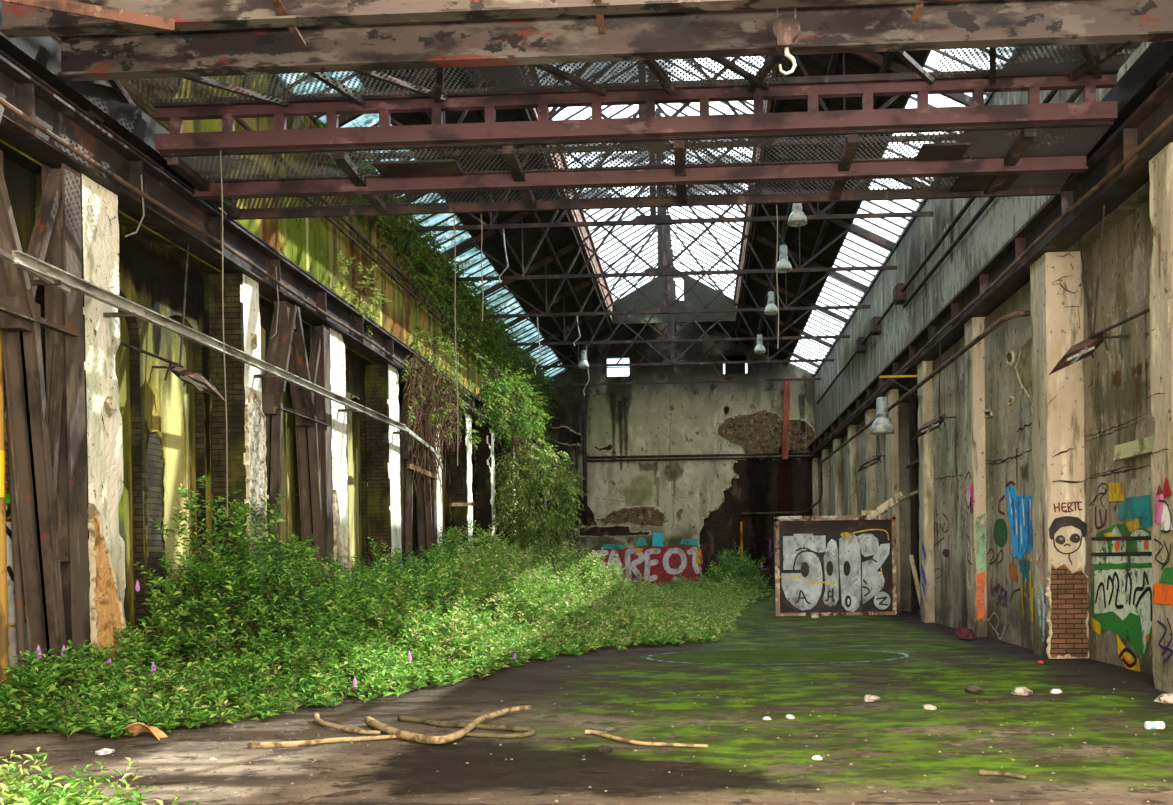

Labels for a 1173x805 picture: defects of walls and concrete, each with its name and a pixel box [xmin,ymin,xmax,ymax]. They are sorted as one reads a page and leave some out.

spalling [3,360,11,522]
spalling [142,418,167,596]
spalling [546,462,666,538]
damp [606,378,632,470]
damp [639,462,684,506]
spalling [696,405,815,590]
spalling [88,503,131,686]
spalling [1045,561,1089,659]